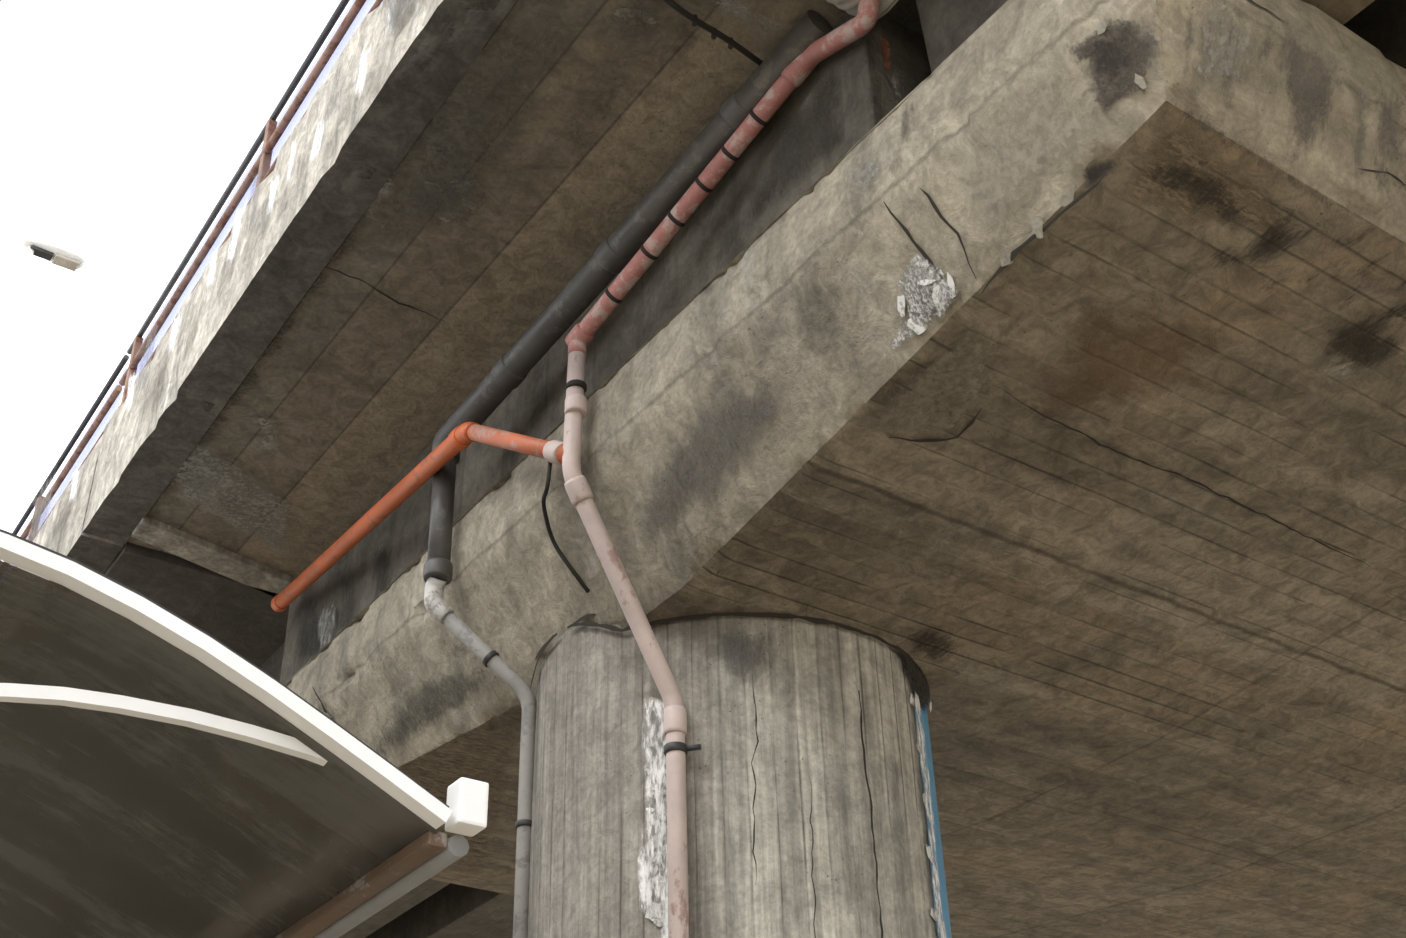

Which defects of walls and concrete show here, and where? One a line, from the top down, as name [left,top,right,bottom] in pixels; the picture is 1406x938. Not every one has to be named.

peeling [898,295,927,335]
crack [884,187,976,288]
peeling [917,272,956,304]
spalling [981,161,1116,294]
damp [1324,304,1406,375]
crack [1357,168,1406,186]
damp [380,672,485,753]
peeling [638,699,668,938]
crack [751,673,759,877]
crack [858,690,883,938]
peeling [899,628,953,938]